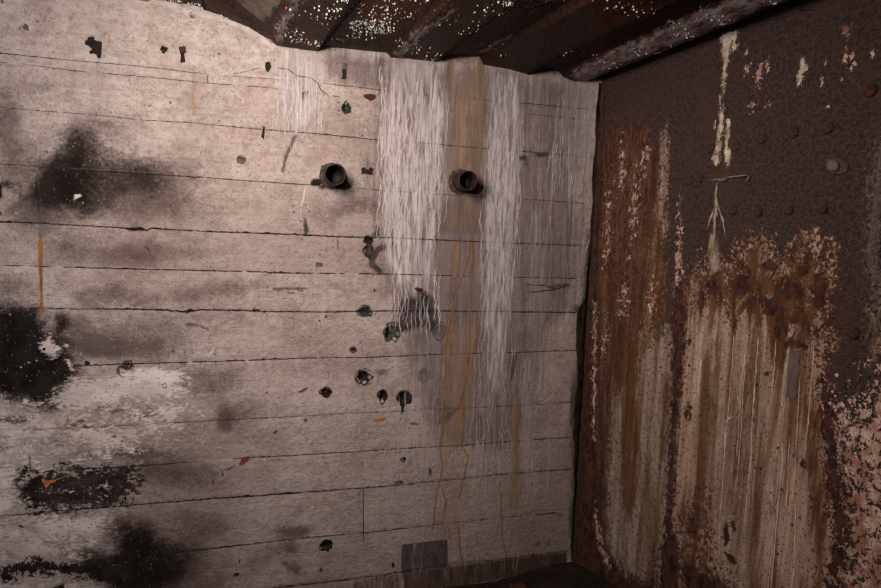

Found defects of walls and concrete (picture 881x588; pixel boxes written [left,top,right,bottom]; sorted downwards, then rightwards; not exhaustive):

corrosion [432,240,477,563]
damp [158,0,786,448]
corrosion [576,84,851,588]
peeling [572,83,881,588]
damp [720,327,776,522]
damp [768,346,814,586]
damp [796,56,809,86]
peeling [841,25,857,81]